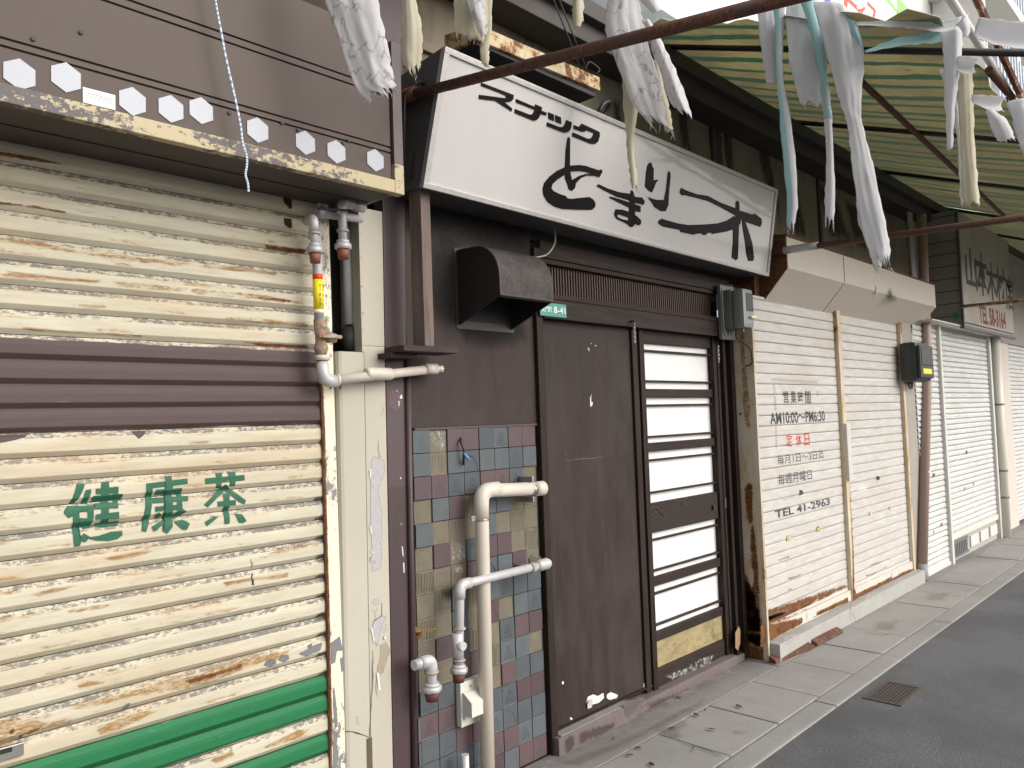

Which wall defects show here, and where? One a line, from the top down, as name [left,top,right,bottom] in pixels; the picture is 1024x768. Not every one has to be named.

corrosion [0,152,60,164]
corrosion [0,202,65,213]
corrosion [266,245,306,254]
corrosion [14,272,98,282]
corrosion [142,284,291,302]
peeling [370,457,385,572]
corrosion [745,483,913,664]
flaking render [371,599,391,694]
corrosion [0,651,288,744]